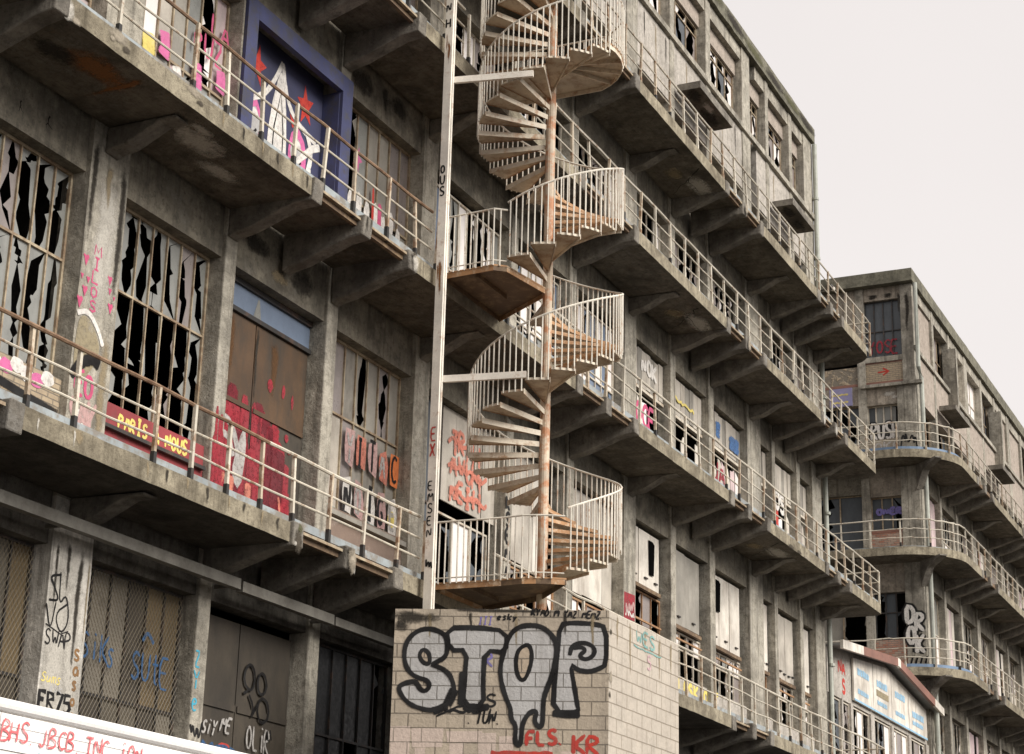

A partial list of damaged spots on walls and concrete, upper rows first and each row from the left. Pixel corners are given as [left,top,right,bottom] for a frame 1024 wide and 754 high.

damp [41,545,90,713]